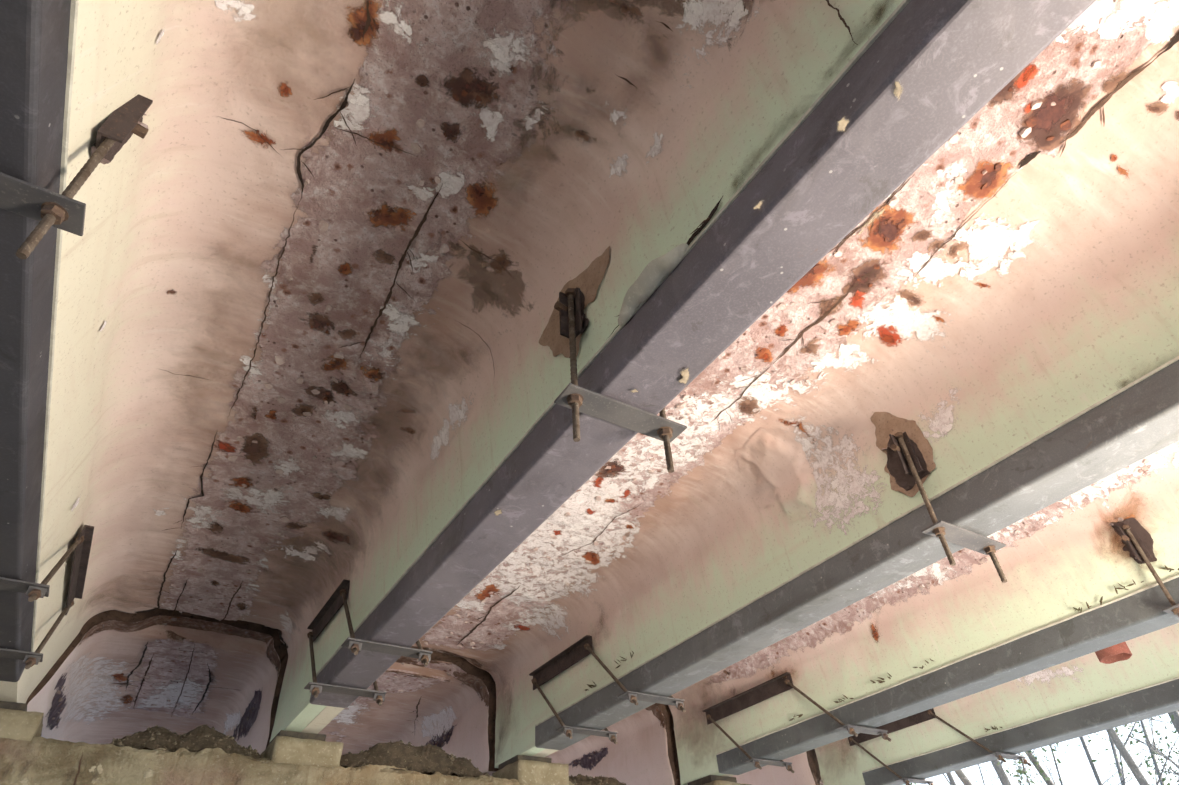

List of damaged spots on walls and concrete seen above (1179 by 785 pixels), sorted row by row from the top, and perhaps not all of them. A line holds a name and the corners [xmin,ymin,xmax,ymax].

crack [147,79,418,611]
spalling [79,0,574,720]
water stain [406,251,439,273]
water stain [451,161,1046,650]
spalling [328,0,1179,742]
crack [714,264,880,431]
rust [820,204,969,336]
rust [957,159,1014,200]
rust [989,65,1039,107]
crack [913,33,1179,280]
rust [1017,71,1128,152]
spalling [233,687,263,741]